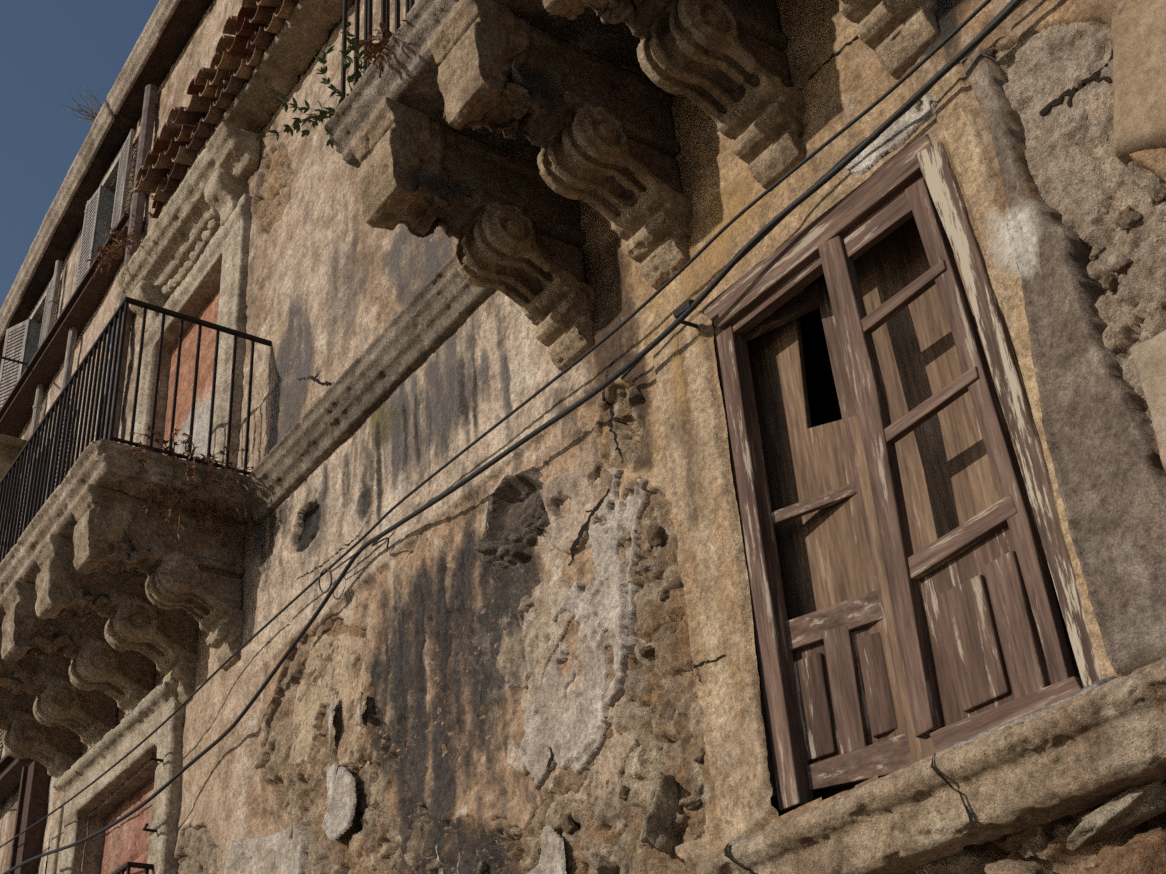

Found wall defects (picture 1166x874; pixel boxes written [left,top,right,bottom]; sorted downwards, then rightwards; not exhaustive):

spalling [993,20,1166,431]
leakage [357,335,509,518]
crack [602,358,623,463]
crack [568,488,609,566]
spalling [177,385,710,874]
leakage [370,518,539,874]
crack [931,753,975,829]